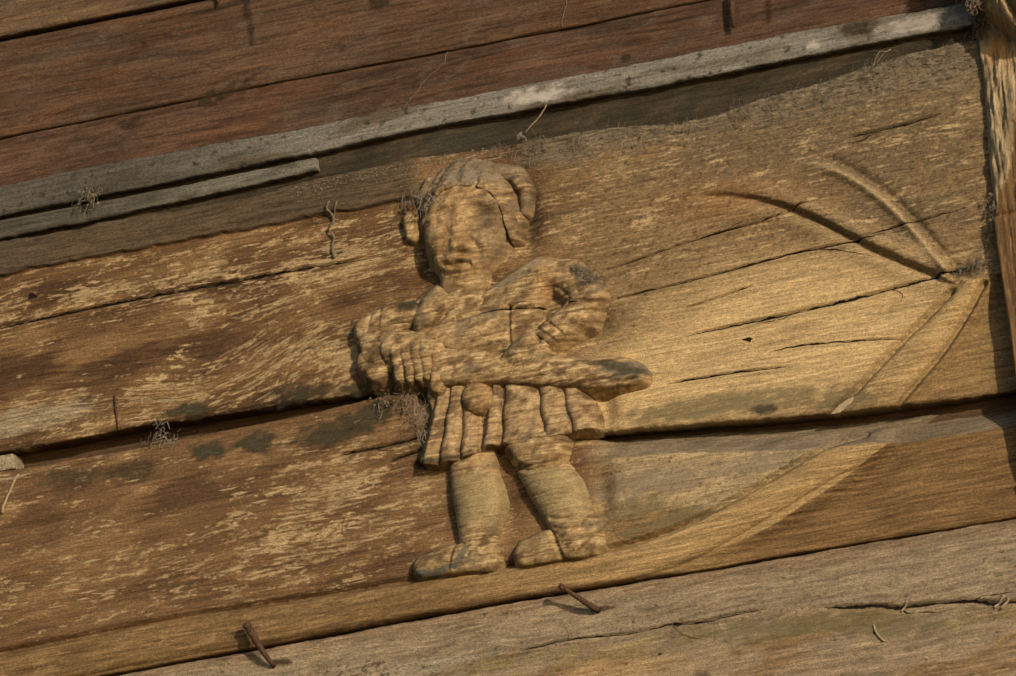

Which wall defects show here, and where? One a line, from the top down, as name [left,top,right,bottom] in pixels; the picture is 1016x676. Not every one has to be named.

crack [482,198,970,313]
crack [684,266,976,337]
crack [671,339,904,384]
crack [826,592,1016,614]